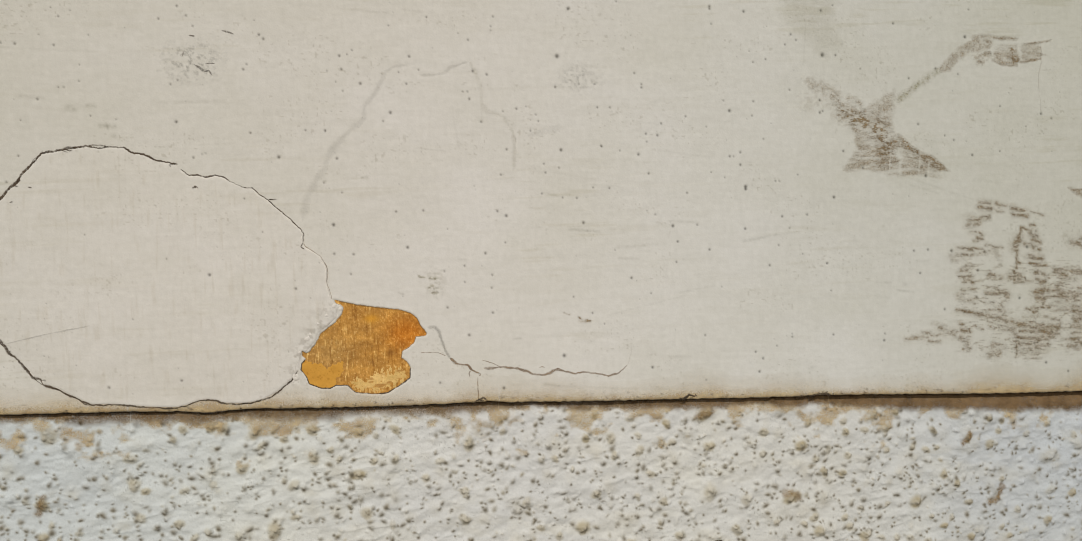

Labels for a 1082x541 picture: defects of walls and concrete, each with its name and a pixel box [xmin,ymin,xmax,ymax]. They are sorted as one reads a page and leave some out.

crack [0,144,333,300]
crack [0,340,297,409]
peeling [291,300,427,394]
crack [421,352,624,399]